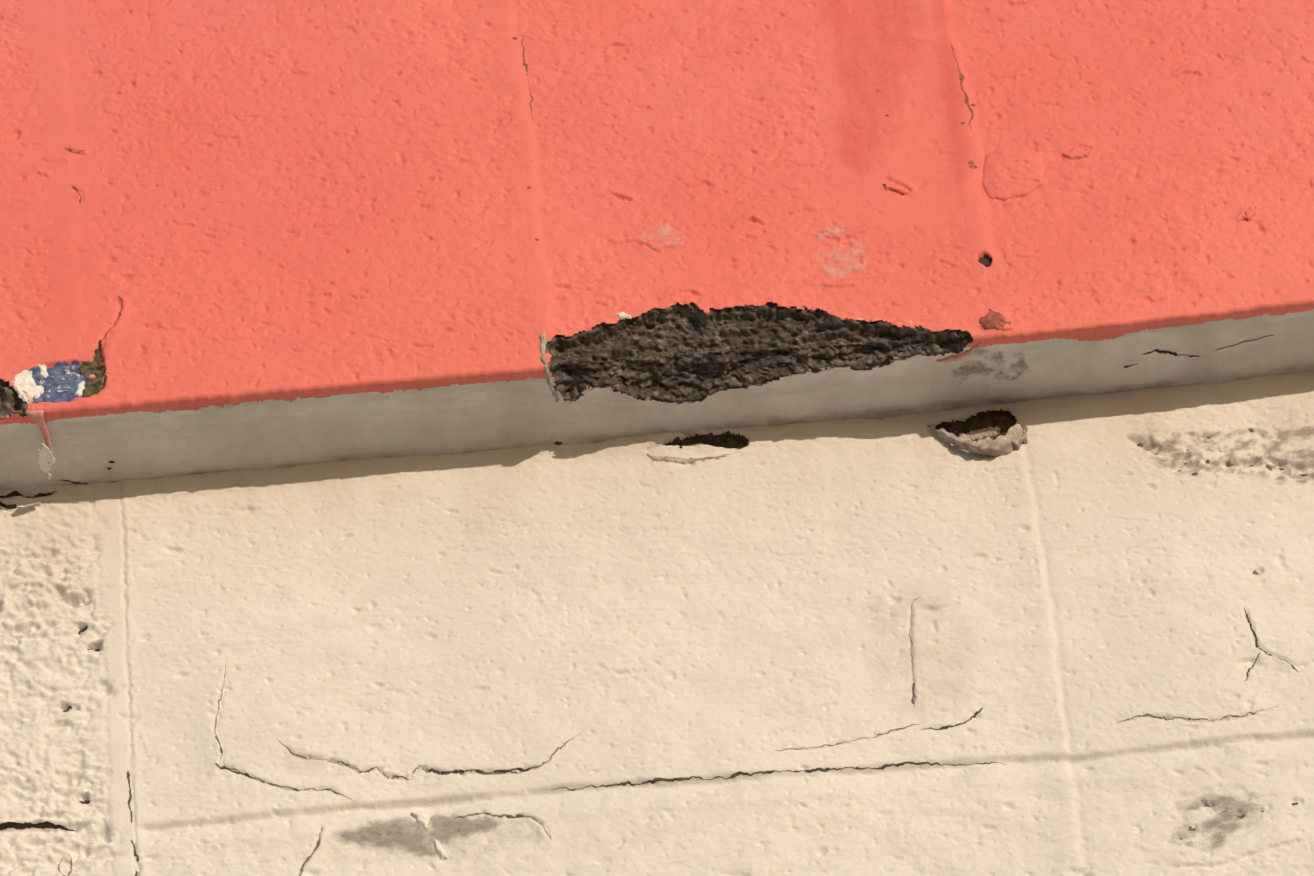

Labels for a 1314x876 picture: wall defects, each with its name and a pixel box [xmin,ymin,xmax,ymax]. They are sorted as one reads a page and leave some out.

spalling [539,302,982,405]
crack [1124,335,1274,368]
peeling [0,349,108,480]
peeling [927,409,1028,457]
crack [0,461,117,509]
crack [214,596,1006,801]
crack [0,821,75,876]
crack [127,771,139,876]